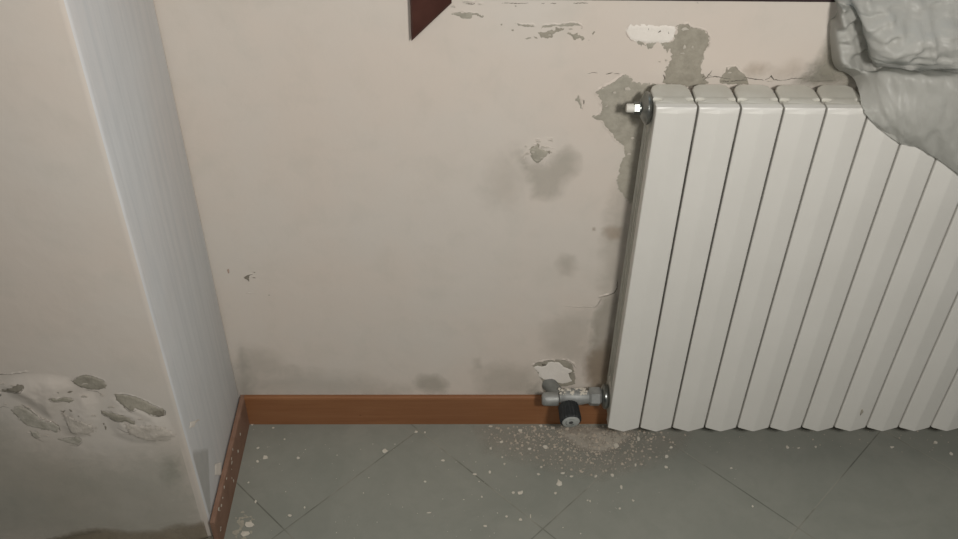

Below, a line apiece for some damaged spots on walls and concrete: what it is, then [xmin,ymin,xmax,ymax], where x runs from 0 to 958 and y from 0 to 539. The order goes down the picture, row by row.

peeling [451,10,484,19]
peeling [501,21,595,40]
flaking render [575,21,749,204]
flaking render [531,358,577,387]
damp [65,524,208,539]